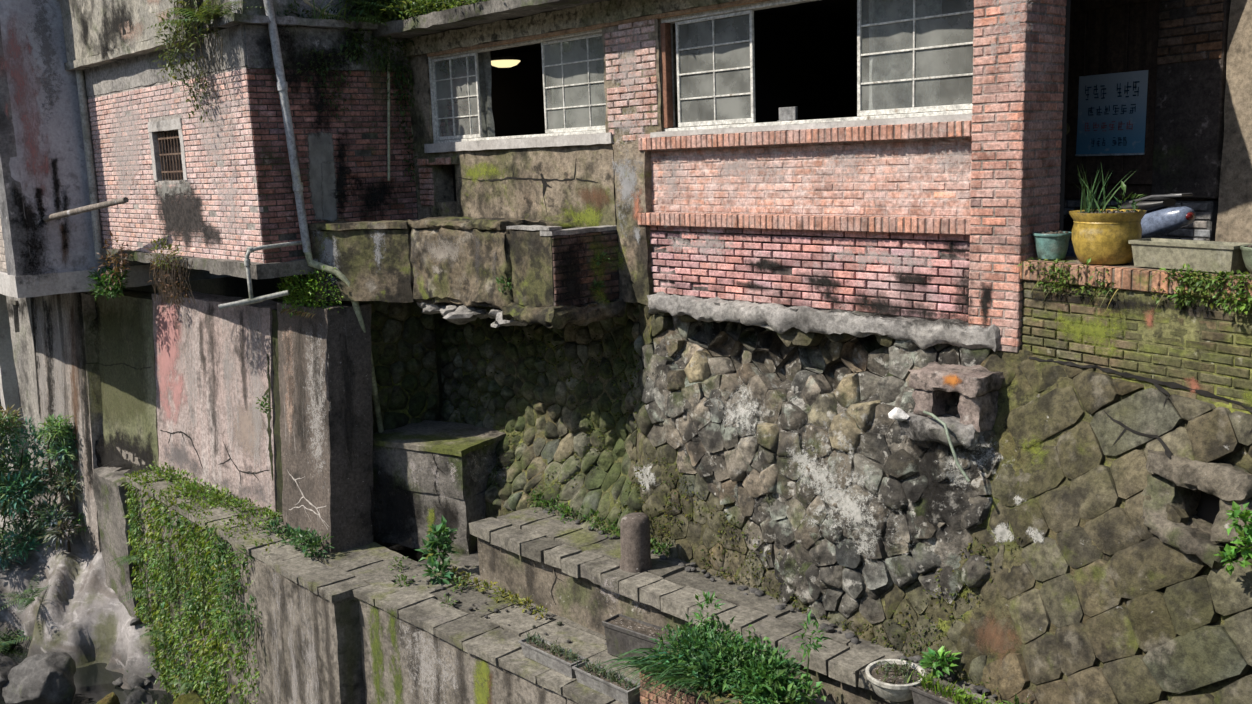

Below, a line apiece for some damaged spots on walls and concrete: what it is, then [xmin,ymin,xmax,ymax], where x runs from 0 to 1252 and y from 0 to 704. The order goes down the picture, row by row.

damp [77,0,133,57]
damp [10,158,69,283]
crack [458,161,598,215]
damp [7,297,55,428]
damp [77,292,198,484]
crack [160,354,328,528]